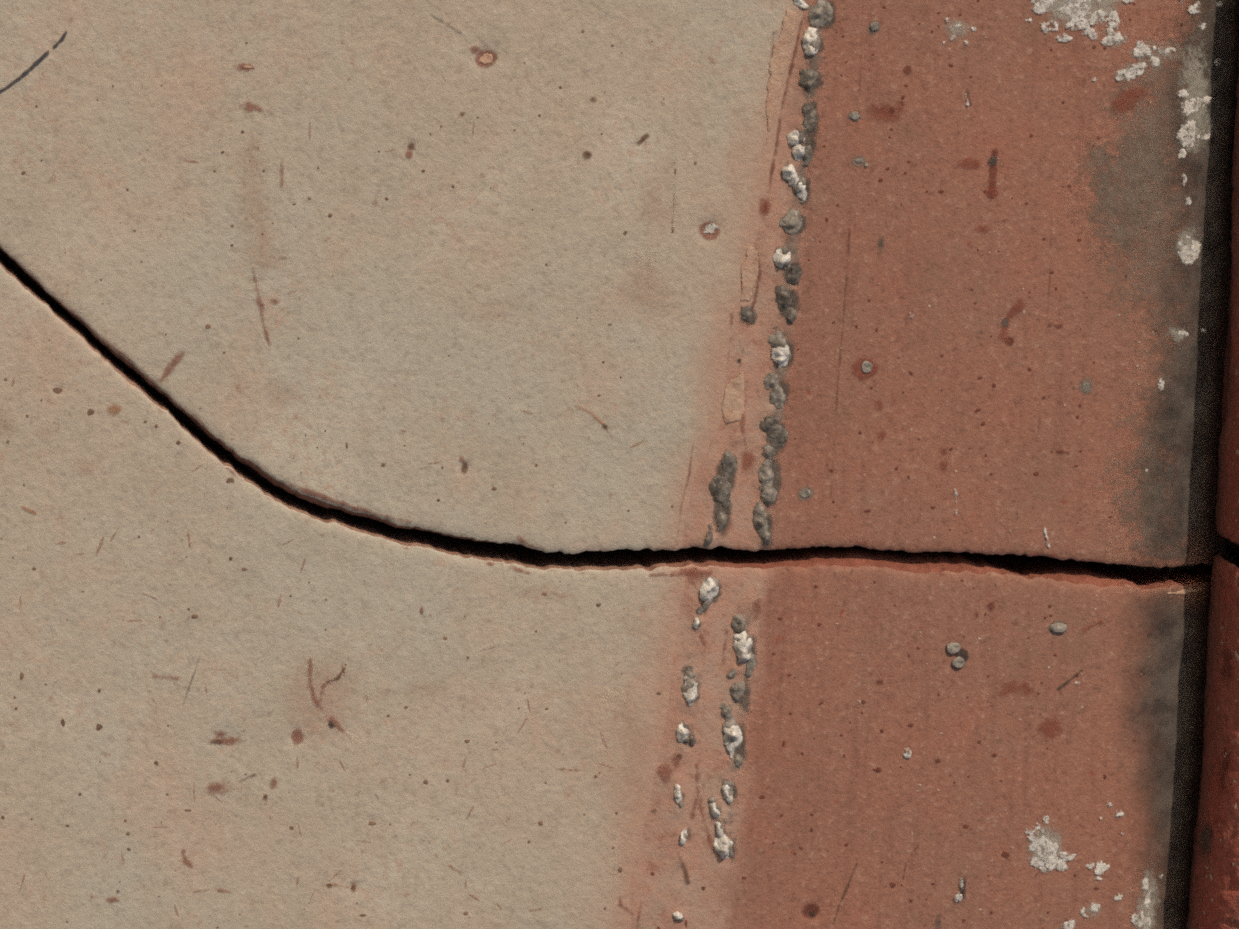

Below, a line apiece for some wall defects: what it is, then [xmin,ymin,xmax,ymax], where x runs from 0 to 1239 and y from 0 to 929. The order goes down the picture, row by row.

crack [0,247,1212,595]
water stain [1092,0,1239,558]
water stain [1139,597,1210,929]